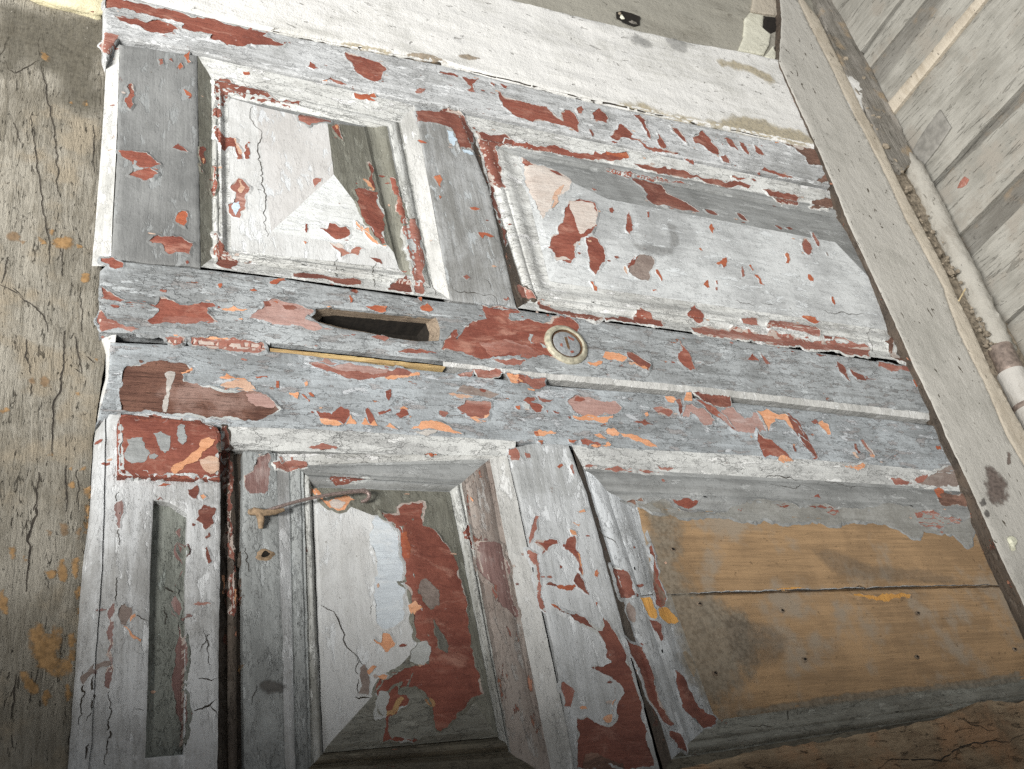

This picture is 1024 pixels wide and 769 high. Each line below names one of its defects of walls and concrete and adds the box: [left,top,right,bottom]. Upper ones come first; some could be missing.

peeling [90,0,290,61]
crack [250,106,269,237]
peeling [413,70,833,292]
peeling [302,160,433,313]
peeling [93,271,832,769]
peeling [620,465,976,549]
damp [980,467,1008,517]
crack [624,584,998,598]
peeling [845,590,912,604]
crack [321,605,370,699]